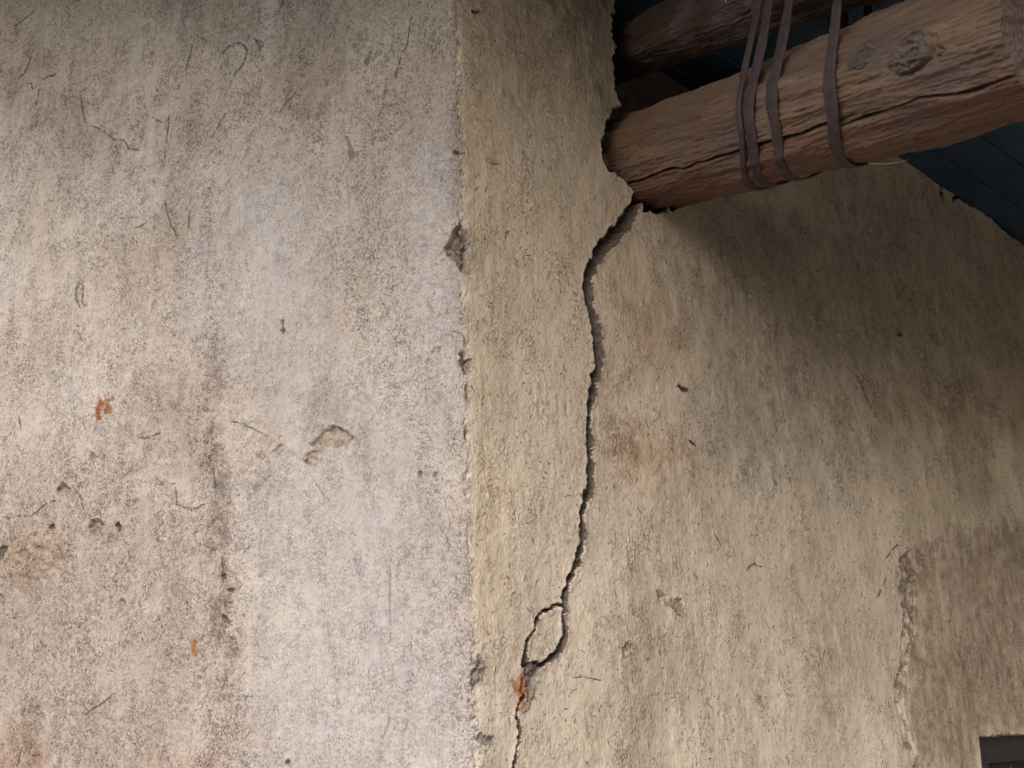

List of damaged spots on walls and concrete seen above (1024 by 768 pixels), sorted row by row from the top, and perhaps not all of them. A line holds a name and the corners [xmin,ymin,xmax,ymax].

spalling [442,222,471,274]
spalling [302,425,355,466]
crack [512,192,643,768]
peeling [894,548,927,768]